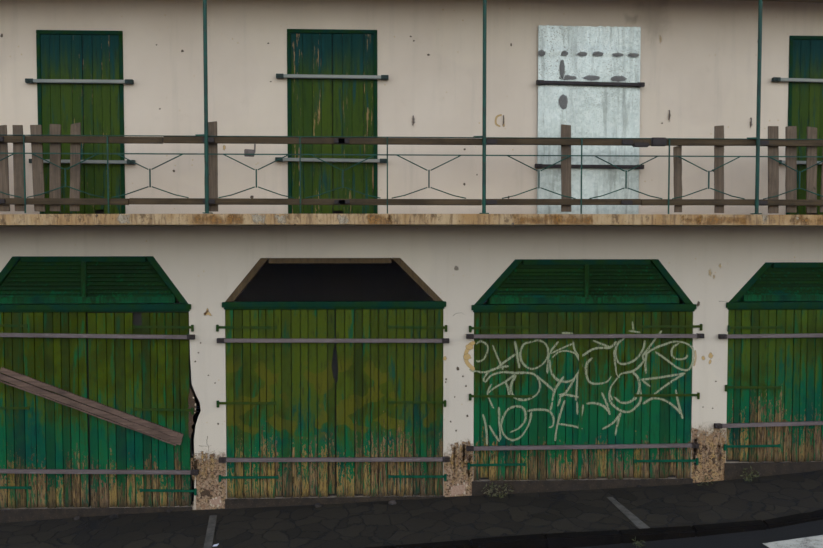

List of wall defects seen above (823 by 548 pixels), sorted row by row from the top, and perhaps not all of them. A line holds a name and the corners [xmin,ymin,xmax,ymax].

flaking render [200,489,222,507]
flaking render [449,482,468,496]